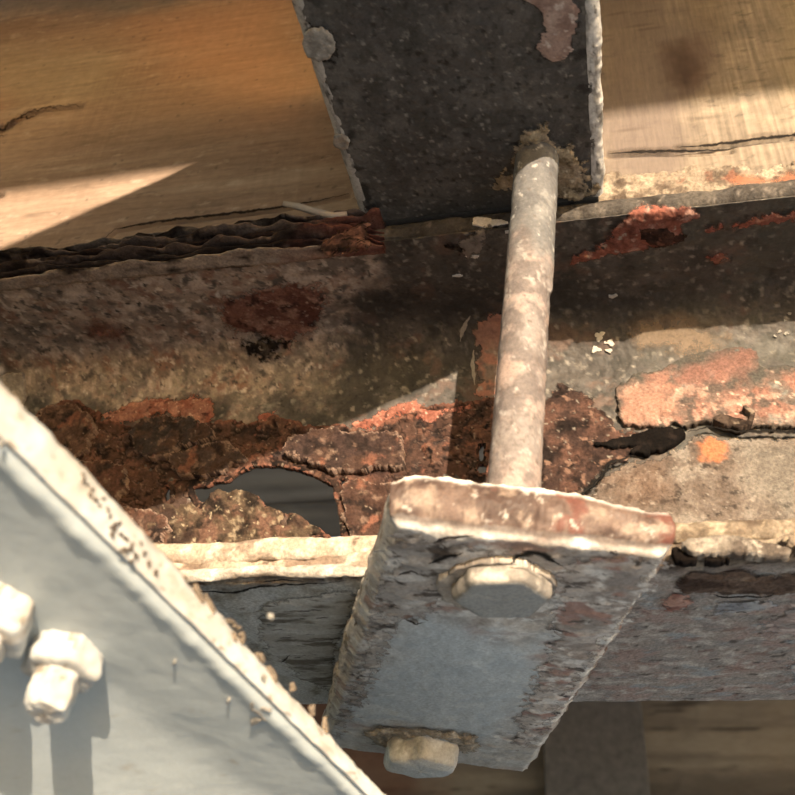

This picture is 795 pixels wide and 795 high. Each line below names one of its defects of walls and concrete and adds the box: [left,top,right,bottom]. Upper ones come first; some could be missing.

peeling [524,0,582,62]
crack [0,104,75,136]
crack [609,133,795,154]
crack [688,426,795,434]
rust [35,397,495,583]
peeling [308,532,513,738]
peeling [510,551,694,751]